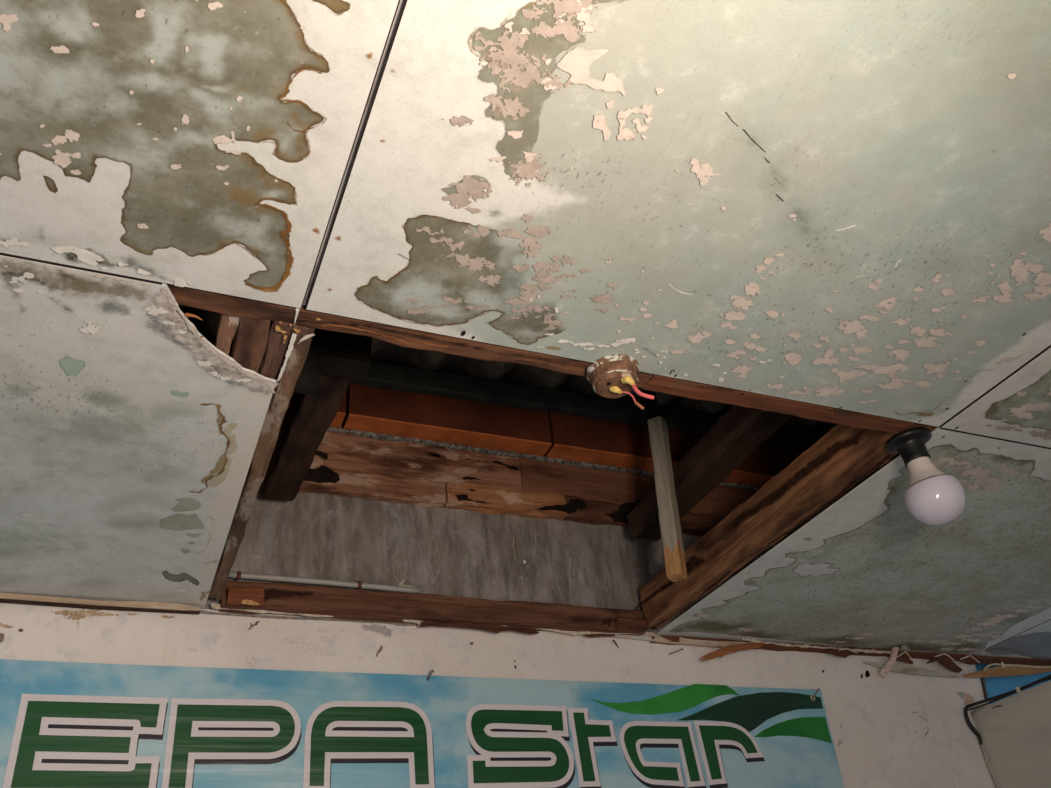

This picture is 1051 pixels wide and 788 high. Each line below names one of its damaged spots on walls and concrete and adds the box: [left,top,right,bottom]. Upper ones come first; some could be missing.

water stain [313,0,350,14]
peeling [473,0,664,141]
water stain [0,0,330,292]
peeling [443,116,474,127]
peeling [490,151,550,186]
peeling [675,158,720,186]
water stain [0,262,145,312]
peeling [404,175,987,404]
peeling [971,252,1051,304]
spalling [51,246,279,394]
water stain [160,498,211,554]
water stain [162,571,199,585]